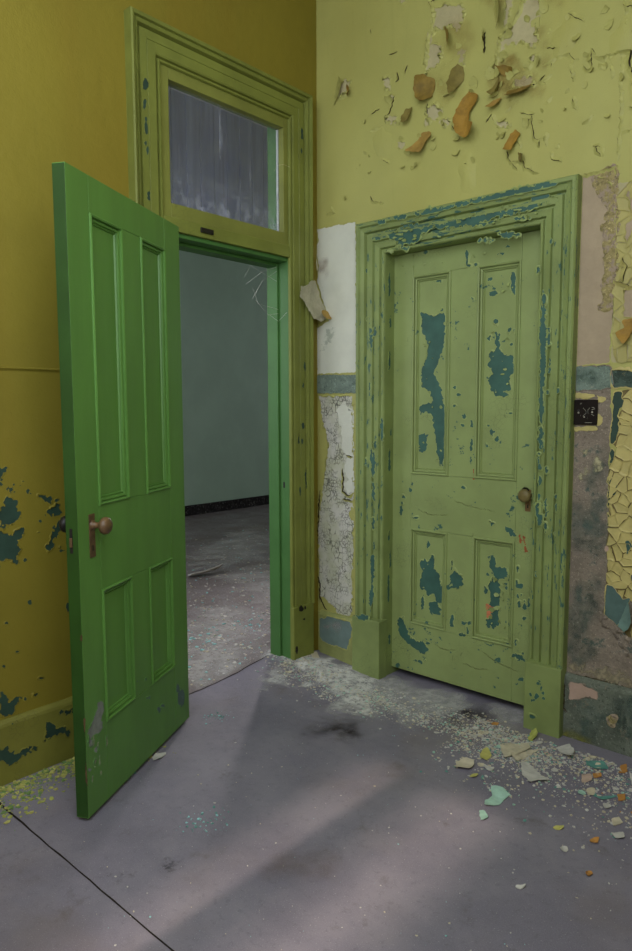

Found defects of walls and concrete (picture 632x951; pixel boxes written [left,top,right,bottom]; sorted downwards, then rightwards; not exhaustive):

peeling [382,0,548,171]
crack [480,32,505,70]
crack [486,0,632,178]
peeling [371,180,558,256]
peeling [418,311,462,467]
peeling [486,318,515,399]
flaking render [567,163,632,700]
peeling [0,466,65,568]
peeling [419,540,471,637]
peeling [483,554,530,630]
peeling [0,675,45,725]
peeling [0,707,73,767]